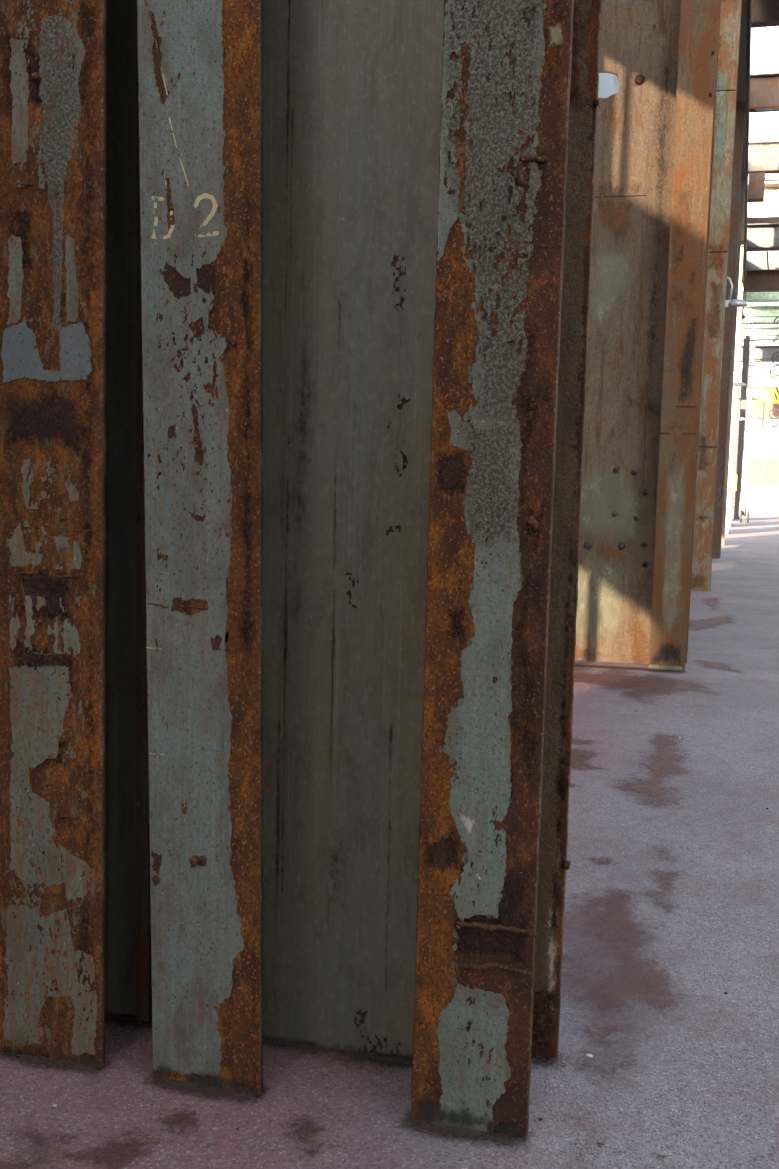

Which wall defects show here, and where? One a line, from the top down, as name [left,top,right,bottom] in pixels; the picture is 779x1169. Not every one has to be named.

peeling [7,0,86,330]
rust [5,0,96,333]
rust [441,41,472,219]
rust [16,570,73,623]
peeling [3,595,98,1056]
peeling [137,0,259,1097]
rust [424,834,528,960]
peeling [412,0,594,1142]
water stain [563,849,678,1044]
water stain [574,644,708,703]
water stain [616,735,688,807]
water stain [689,598,731,630]